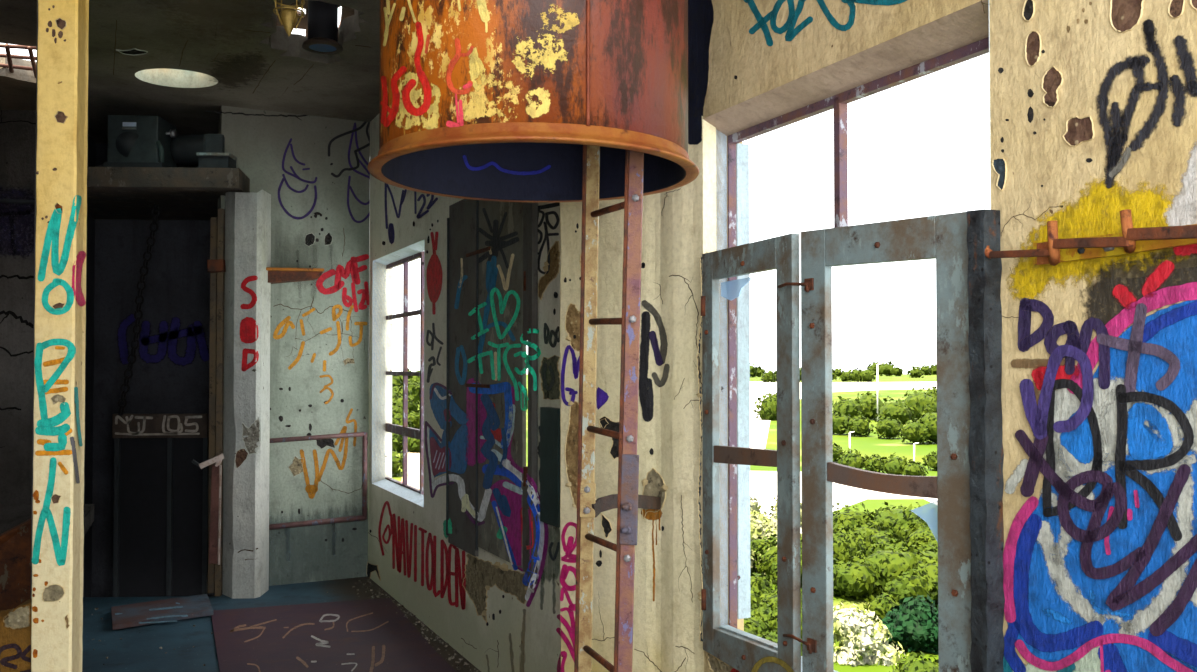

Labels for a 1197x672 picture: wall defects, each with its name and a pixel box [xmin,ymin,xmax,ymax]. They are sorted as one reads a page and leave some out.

spalling [1110,0,1144,33]
spalling [1168,0,1197,18]
spalling [1022,0,1064,135]
spalling [1063,116,1095,147]
peeling [736,143,749,246]
crack [0,273,34,281]
crack [0,310,33,357]
peeling [737,274,750,448]
peeling [696,316,740,672]
flaking render [462,554,528,626]
rust [641,509,662,602]
peeling [737,464,751,619]